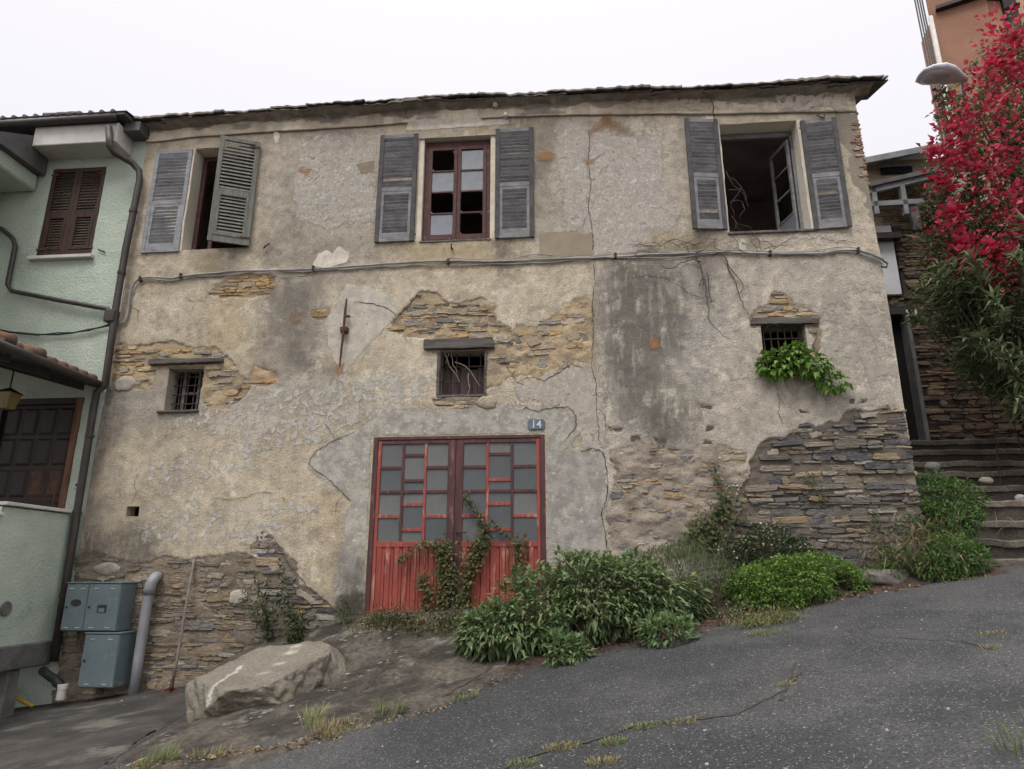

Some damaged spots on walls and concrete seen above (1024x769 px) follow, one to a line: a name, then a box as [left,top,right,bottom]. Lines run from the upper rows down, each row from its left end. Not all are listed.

spalling [207,273,277,299]
crack [309,422,354,511]
spalling [51,282,926,704]
crack [501,124,619,548]